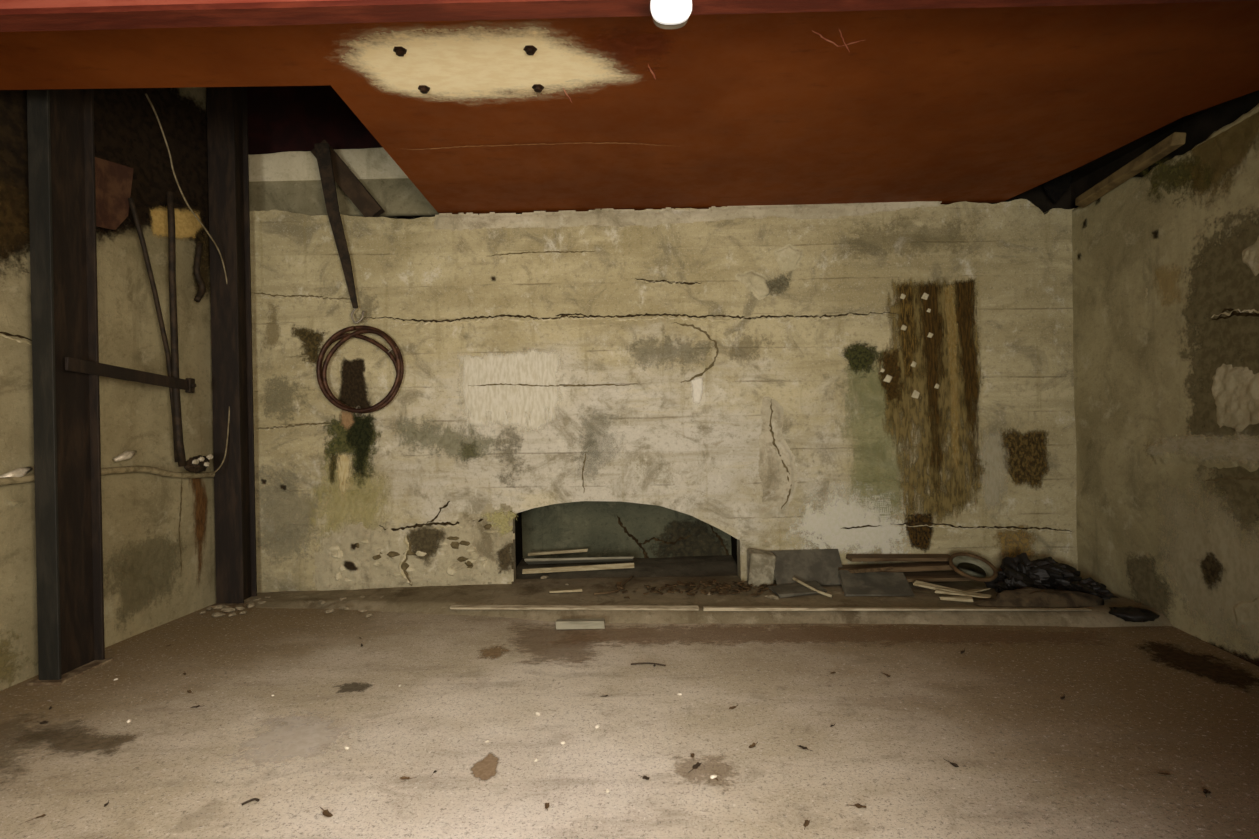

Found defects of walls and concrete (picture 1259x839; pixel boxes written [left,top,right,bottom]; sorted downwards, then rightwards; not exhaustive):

peeling [346,28,628,98]
peeling [1242,236,1259,276]
crack [0,332,32,345]
crack [251,278,896,383]
crack [1211,308,1259,320]
leakage [341,410,354,428]
peeling [1211,364,1259,432]
leakage [329,454,352,500]
leakage [1002,429,1049,488]
crack [379,501,514,586]
spalling [1200,552,1223,590]